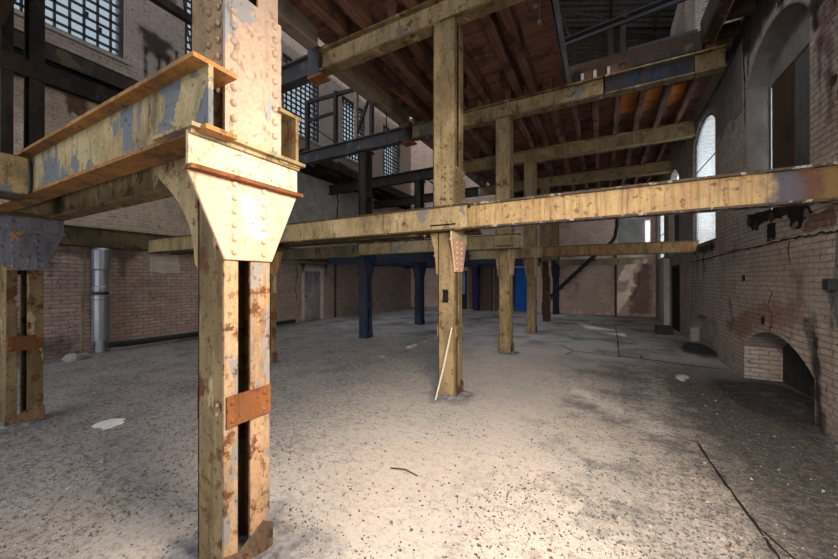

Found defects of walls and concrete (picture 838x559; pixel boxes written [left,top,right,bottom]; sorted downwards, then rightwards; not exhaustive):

peeling [241,196,270,242]
spalling [747,204,837,242]
crack [690,229,838,324]
crack [696,441,795,559]